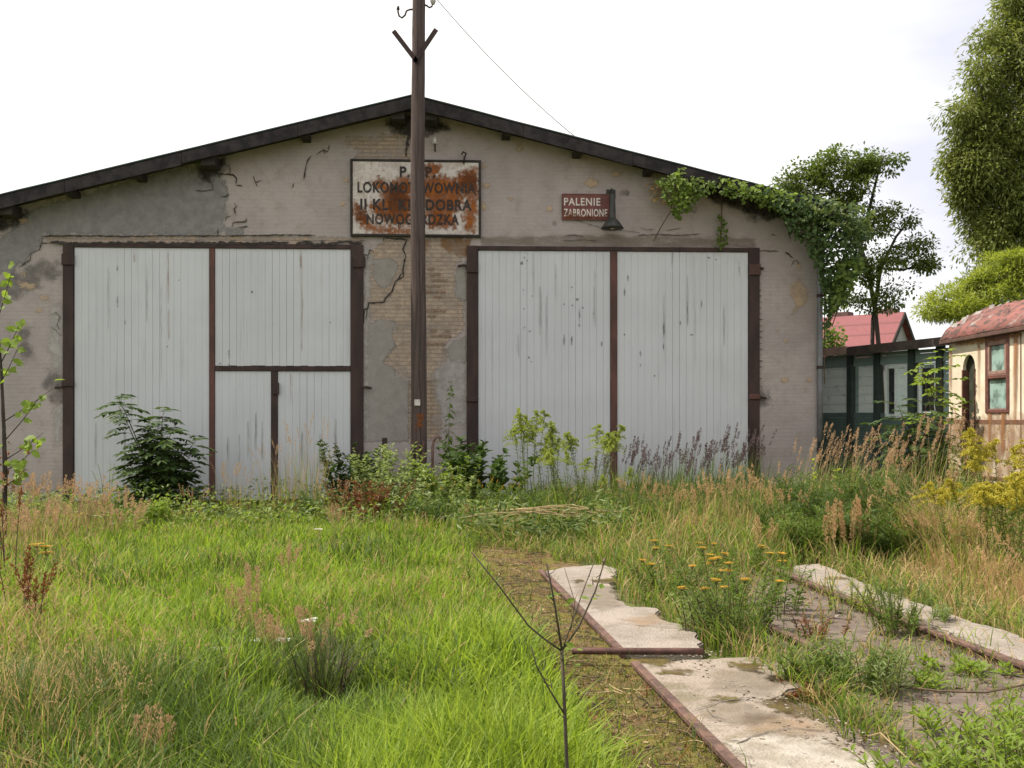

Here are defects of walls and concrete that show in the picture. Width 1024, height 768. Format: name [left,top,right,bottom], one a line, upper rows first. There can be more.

crack [20,166,313,267]
flaking render [48,236,411,438]
crack [363,237,421,460]
flaking render [425,237,470,442]